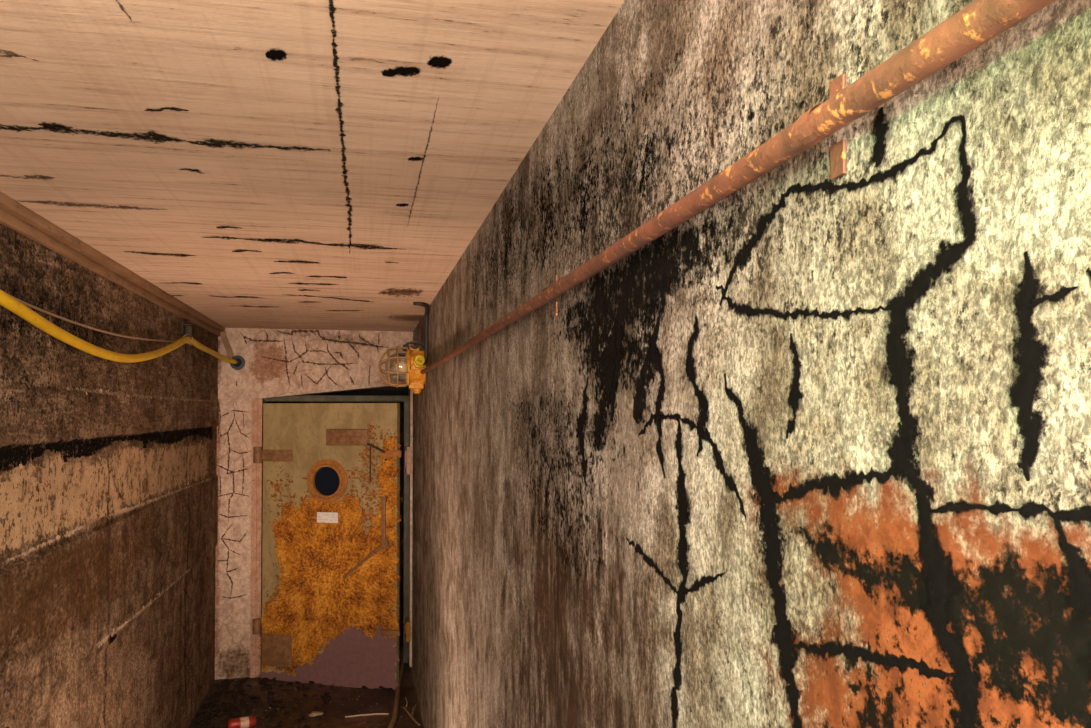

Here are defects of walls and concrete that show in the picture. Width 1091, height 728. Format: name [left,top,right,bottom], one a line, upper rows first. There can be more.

crack [0,0,438,386]
damp [468,49,833,315]
peeling [0,441,209,553]
crack [183,434,191,716]
crack [217,381,250,599]
rust [258,424,402,675]
crack [577,323,623,487]
damp [501,208,751,728]
crack [626,107,1091,728]
damp [744,470,1091,728]